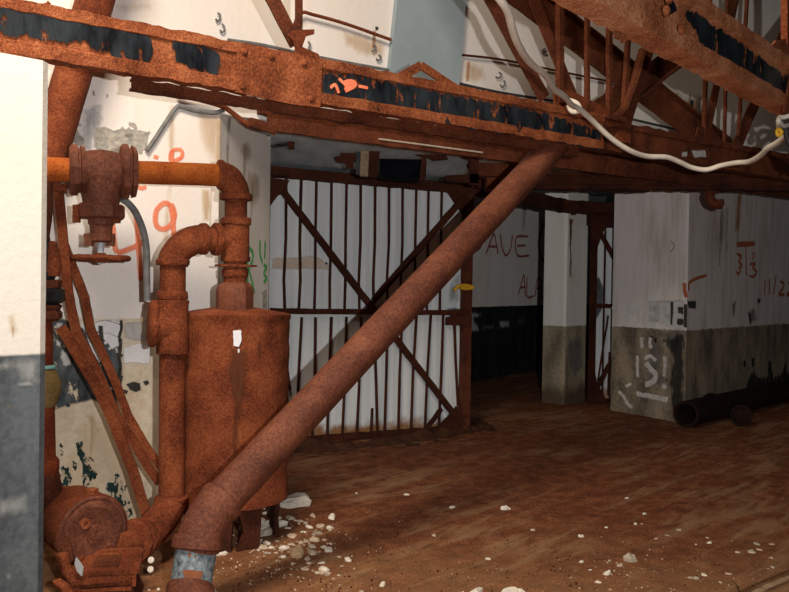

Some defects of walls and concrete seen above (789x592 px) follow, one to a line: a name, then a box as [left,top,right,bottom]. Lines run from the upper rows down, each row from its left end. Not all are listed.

spalling [95,122,150,154]
corrosion [248,117,274,133]
peeling [53,319,98,409]
peeling [81,319,150,401]
peeling [60,441,98,486]
peeling [106,474,133,517]